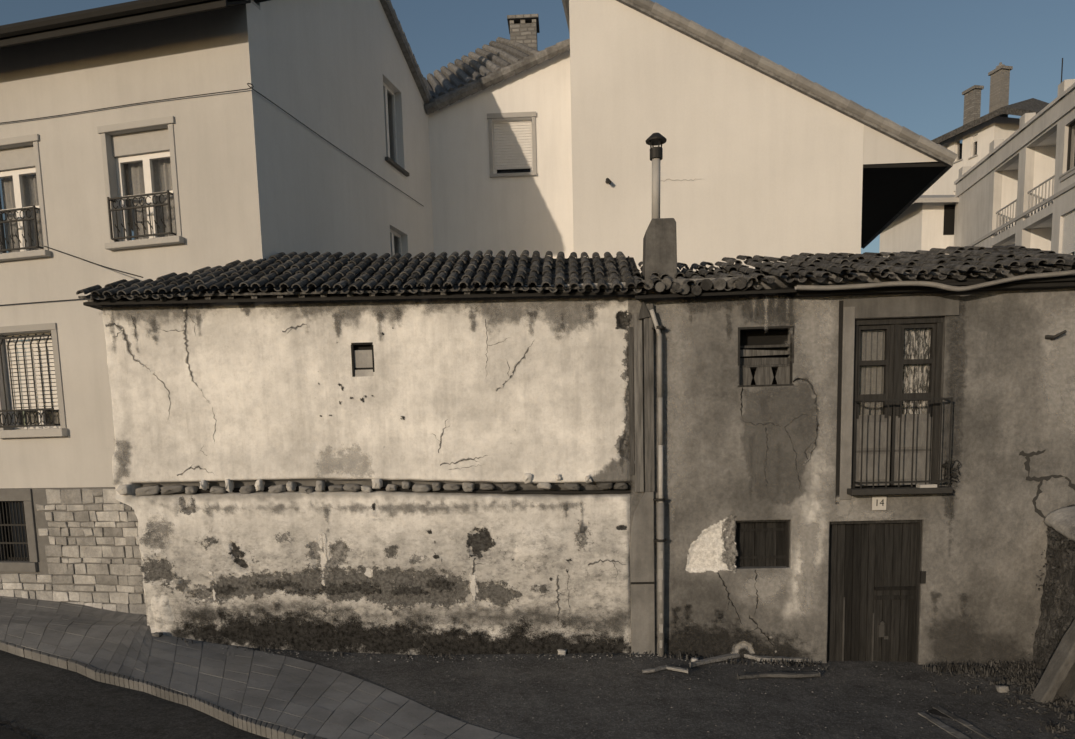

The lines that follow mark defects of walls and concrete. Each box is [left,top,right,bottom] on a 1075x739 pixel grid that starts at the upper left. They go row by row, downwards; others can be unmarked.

crack [485,319,532,391]
crack [105,309,216,476]
crack [434,426,486,470]
flaking render [179,494,196,515]
crack [1019,450,1075,519]
peeling [137,521,553,611]
peeling [566,520,594,572]
peeling [685,516,736,573]
water stain [171,603,631,655]
crack [718,570,777,653]